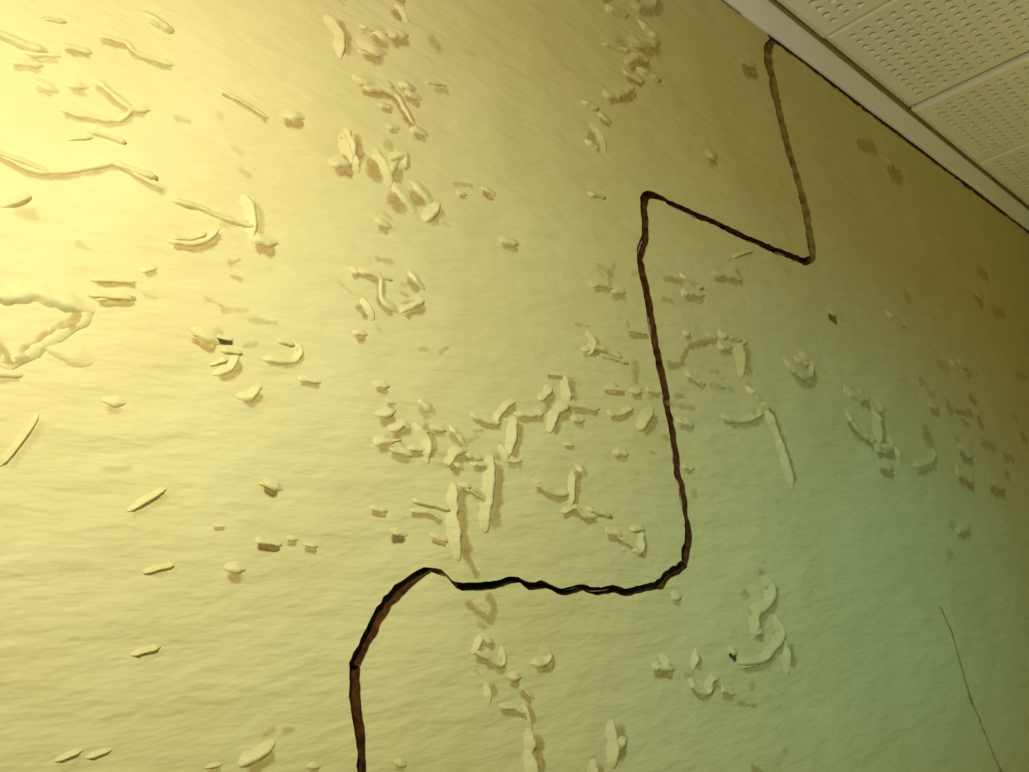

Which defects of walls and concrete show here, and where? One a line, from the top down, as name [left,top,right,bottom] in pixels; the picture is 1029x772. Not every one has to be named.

crack [349,34,1029,772]